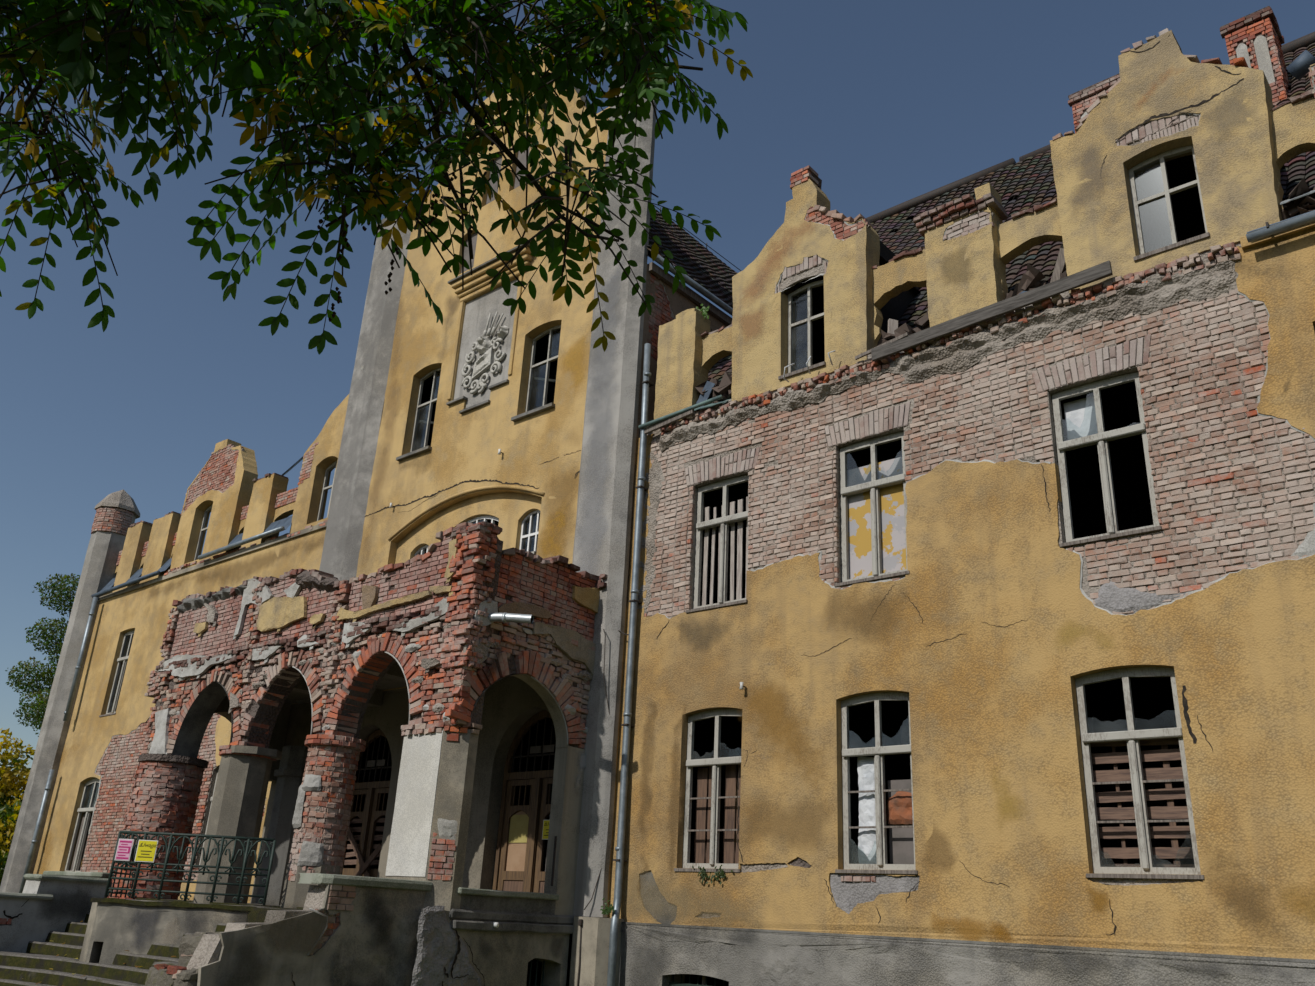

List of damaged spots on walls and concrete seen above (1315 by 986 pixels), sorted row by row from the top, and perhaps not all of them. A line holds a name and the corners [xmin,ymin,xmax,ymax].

crack [1100,66,1244,176]
flaking render [647,264,675,361]
flaking render [637,288,1315,619]
flaking render [158,539,459,679]
flaking render [473,600,553,628]
crack [1182,685,1213,751]
flaking render [80,708,171,873]
flaking render [182,692,241,881]
flaking render [640,870,677,924]
flaking render [830,873,920,914]
crack [442,930,485,986]